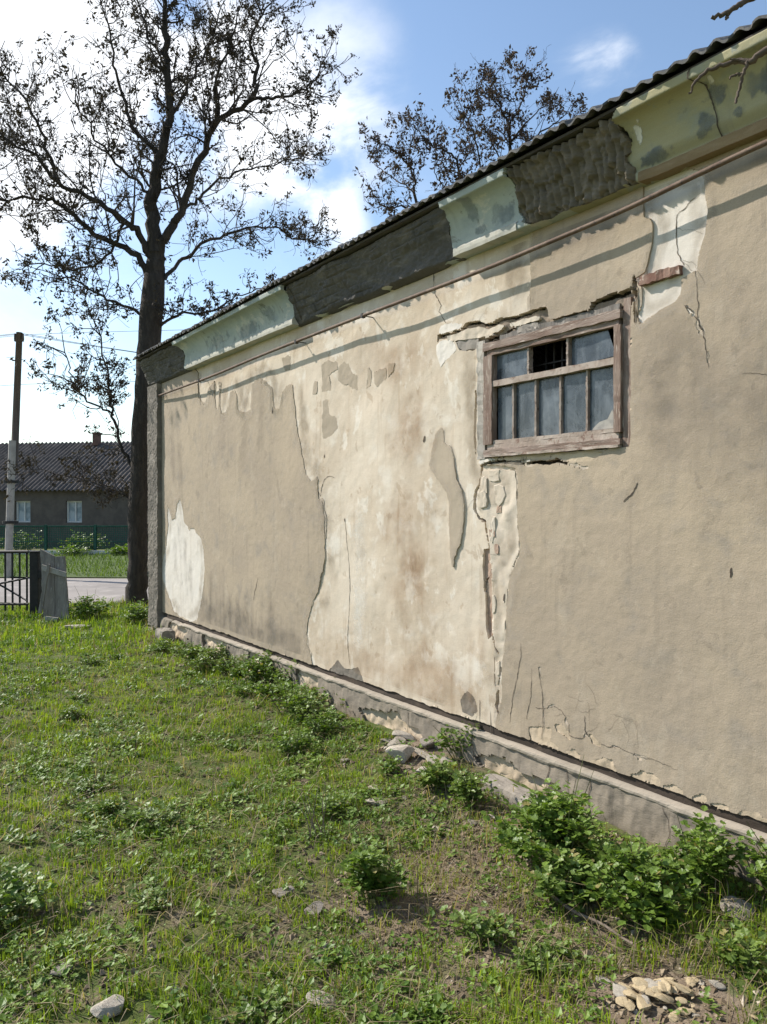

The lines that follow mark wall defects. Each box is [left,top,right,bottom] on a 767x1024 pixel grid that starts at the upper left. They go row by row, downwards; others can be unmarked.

peeling [594,169,708,323]
crack [676,199,710,369]
peeling [196,232,561,728]
peeling [162,500,205,640]
spalling [361,708,422,741]
spalling [479,755,562,796]
flaking render [529,723,617,772]
crack [509,647,677,770]
flaking render [631,770,767,823]